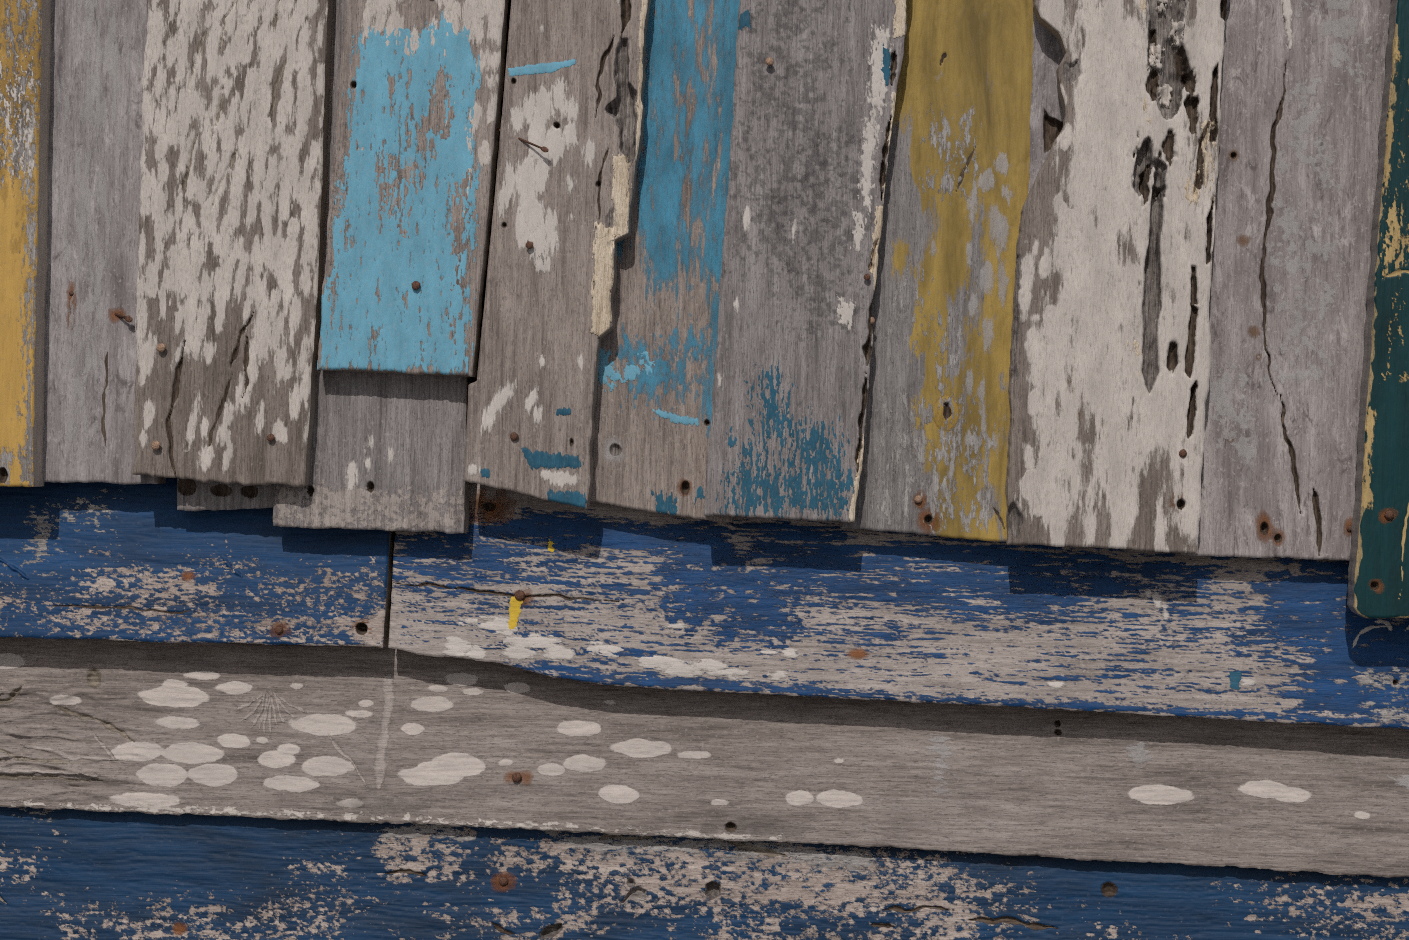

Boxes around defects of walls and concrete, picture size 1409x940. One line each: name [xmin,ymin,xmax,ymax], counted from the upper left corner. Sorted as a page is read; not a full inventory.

crack [595,0,631,118]
crack [597,150,608,225]
crack [1259,61,1322,556]
peeling [0,0,1409,729]
spalling [54,706,135,743]
spalling [0,749,103,781]
peeling [0,799,1051,940]
spalling [1081,882,1139,940]
peeling [1211,871,1409,940]